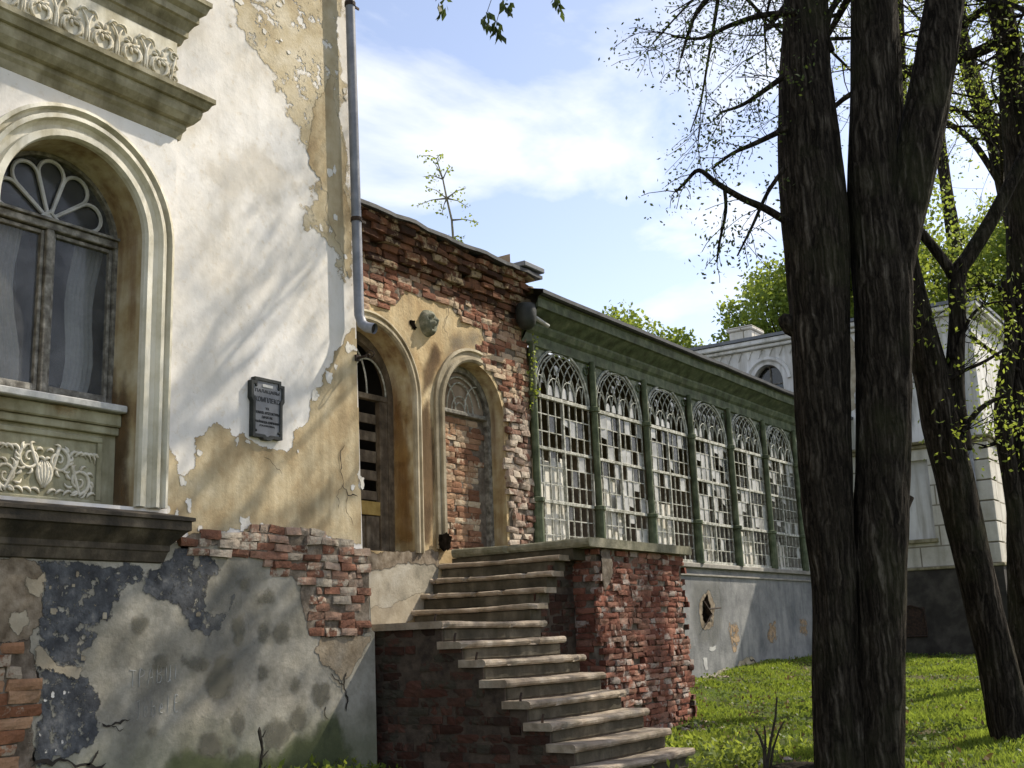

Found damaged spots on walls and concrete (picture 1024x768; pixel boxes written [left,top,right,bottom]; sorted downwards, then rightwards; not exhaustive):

flaking render [230,0,536,545]
crack [336,447,357,523]
flaking render [0,328,452,768]
damp [133,618,149,632]
damp [259,623,289,643]
hole [699,590,722,630]
damp [183,657,234,699]
damp [313,683,330,707]
crack [324,672,349,719]
damp [264,708,306,749]